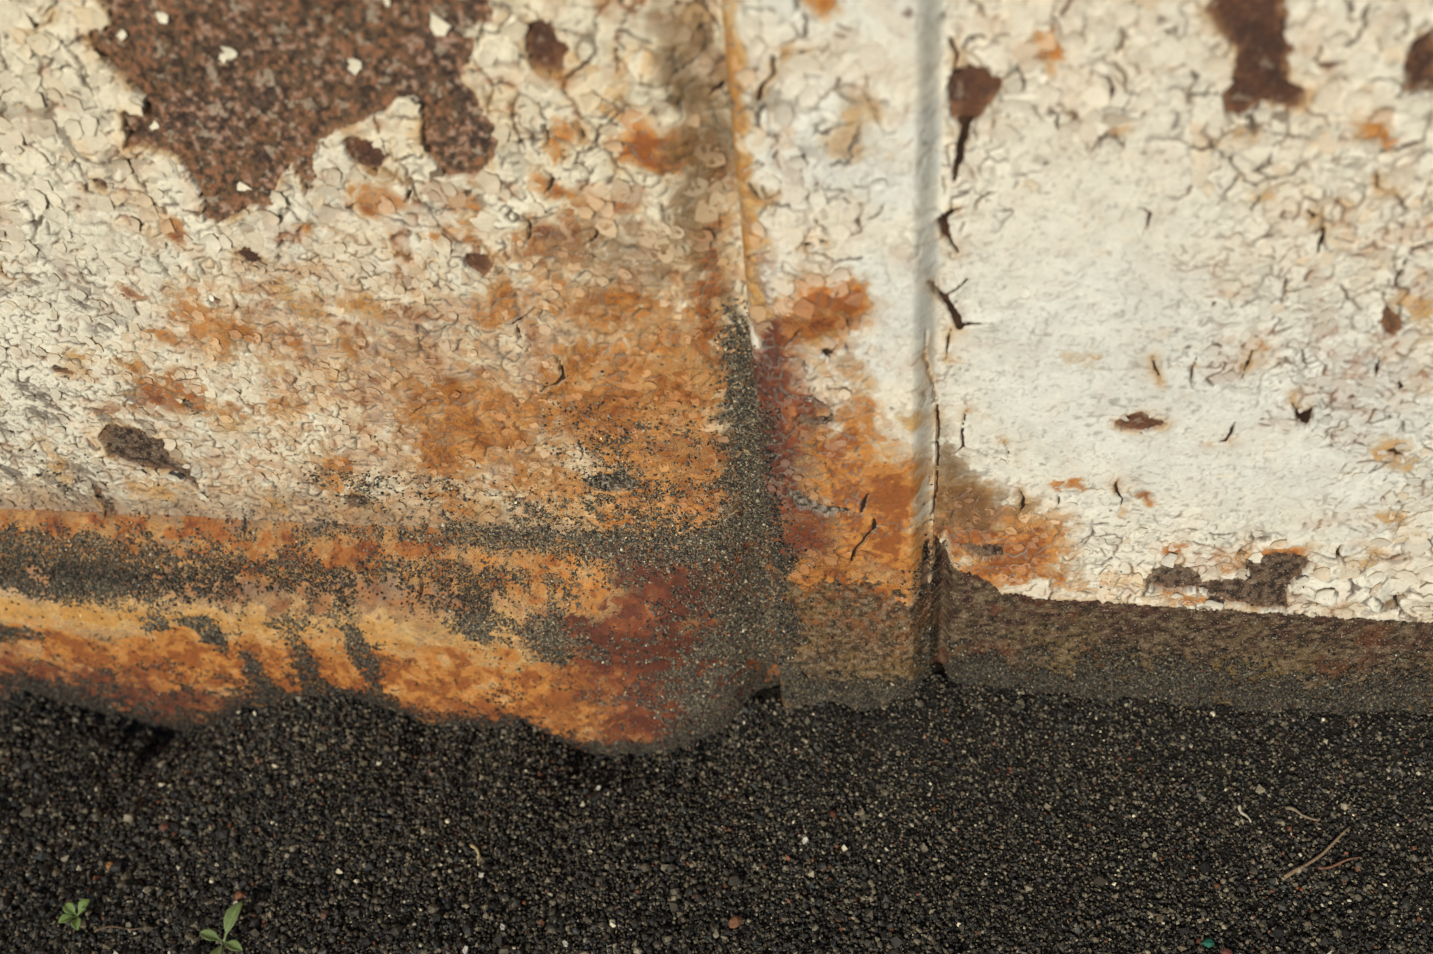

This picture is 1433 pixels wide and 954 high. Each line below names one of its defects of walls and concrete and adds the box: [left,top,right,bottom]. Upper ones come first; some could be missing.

peeling [0,0,569,523]
peeling [464,162,752,542]
rust [0,0,1433,756]
peeling [636,42,888,272]
peeling [749,267,871,514]
crack [842,494,877,561]
crack [923,399,966,561]
crack [939,115,982,361]
peeling [938,0,1433,177]
peeling [942,164,1433,620]
crack [1220,423,1235,442]
crack [1307,209,1325,253]